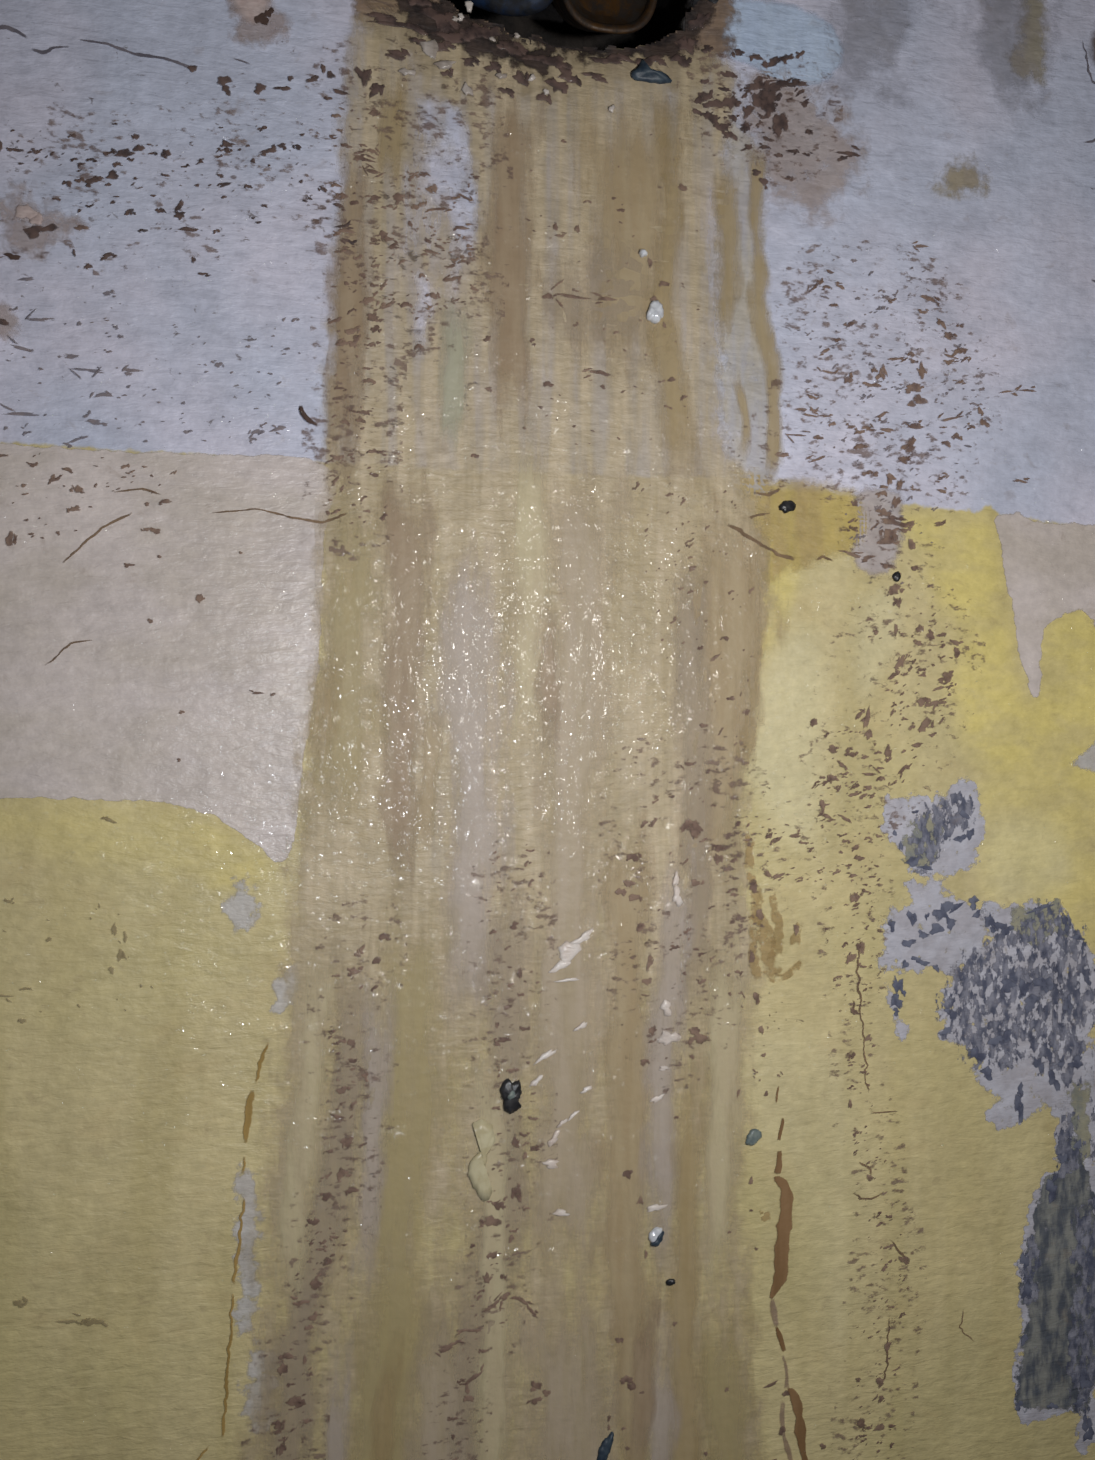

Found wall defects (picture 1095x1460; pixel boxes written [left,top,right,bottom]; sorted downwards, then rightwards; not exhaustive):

damp [0,107,318,246]
damp [10,307,207,448]
damp [27,453,177,513]
peeling [0,443,332,862]
peeling [779,500,796,513]
peeling [852,489,902,582]
peeling [994,512,1095,697]
damp [241,0,991,1460]
spalling [878,779,1095,1455]
rust [761,1087,794,1299]
rust [776,1327,786,1351]
rust [764,1381,826,1460]